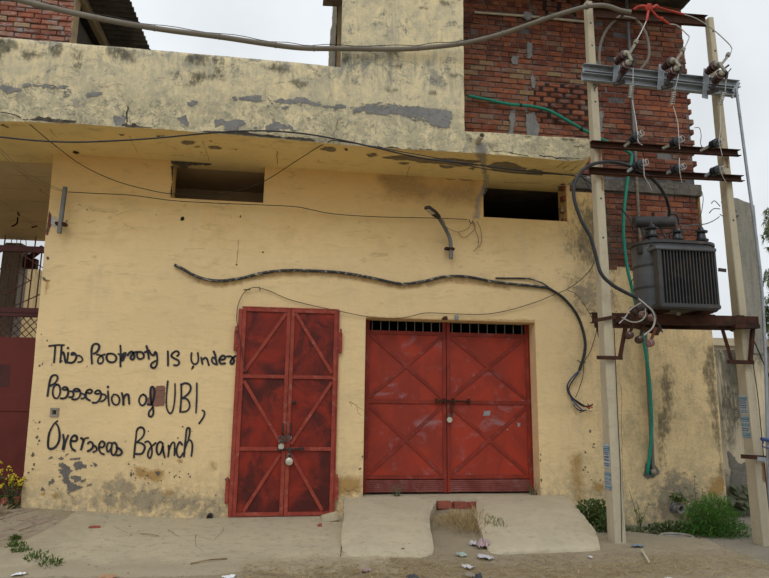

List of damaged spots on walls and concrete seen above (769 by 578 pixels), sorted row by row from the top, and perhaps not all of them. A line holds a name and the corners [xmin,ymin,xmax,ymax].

peeling [0,83,71,98]
peeling [113,115,152,136]
peeling [181,119,315,149]
peeling [230,95,452,129]
water stain [704,348,740,441]
peeling [41,450,97,494]
water stain [653,469,700,523]